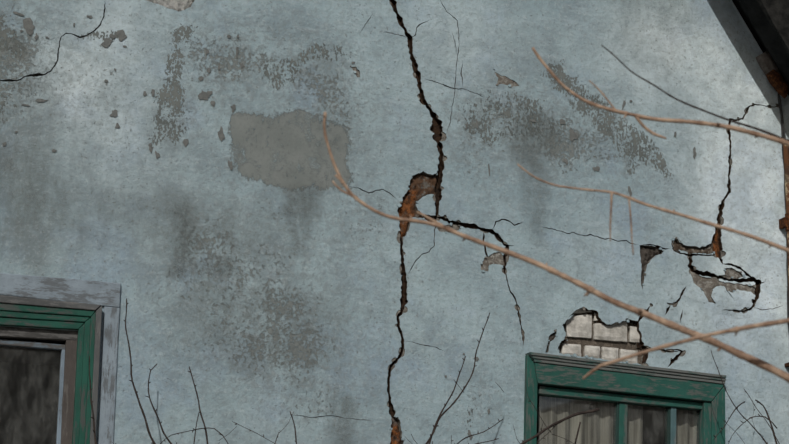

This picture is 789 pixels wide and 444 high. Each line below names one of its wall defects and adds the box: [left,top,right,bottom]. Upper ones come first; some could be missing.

crack [0,4,106,82]
peeling [217,104,353,192]
peeling [458,68,579,148]
peeling [541,59,674,182]
rust [398,189,416,236]
crack [361,0,525,417]
spalling [640,245,663,289]
crack [544,103,783,367]
spalling [671,237,715,255]
spalling [690,268,756,303]
spalling [545,307,644,365]
crack [295,414,371,422]